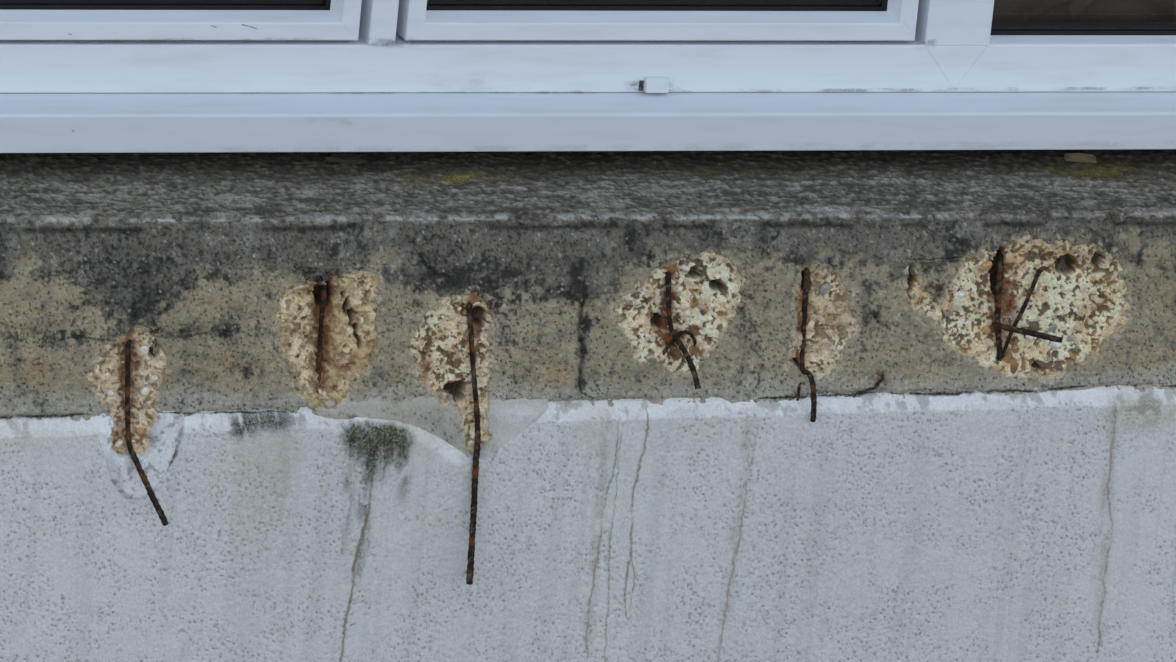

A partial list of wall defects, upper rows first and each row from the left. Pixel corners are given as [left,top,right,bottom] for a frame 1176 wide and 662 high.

spalling [611,251,746,390]
spalling [787,263,859,422]
spalling [906,233,1130,381]
spalling [85,325,185,526]
spalling [273,269,549,585]